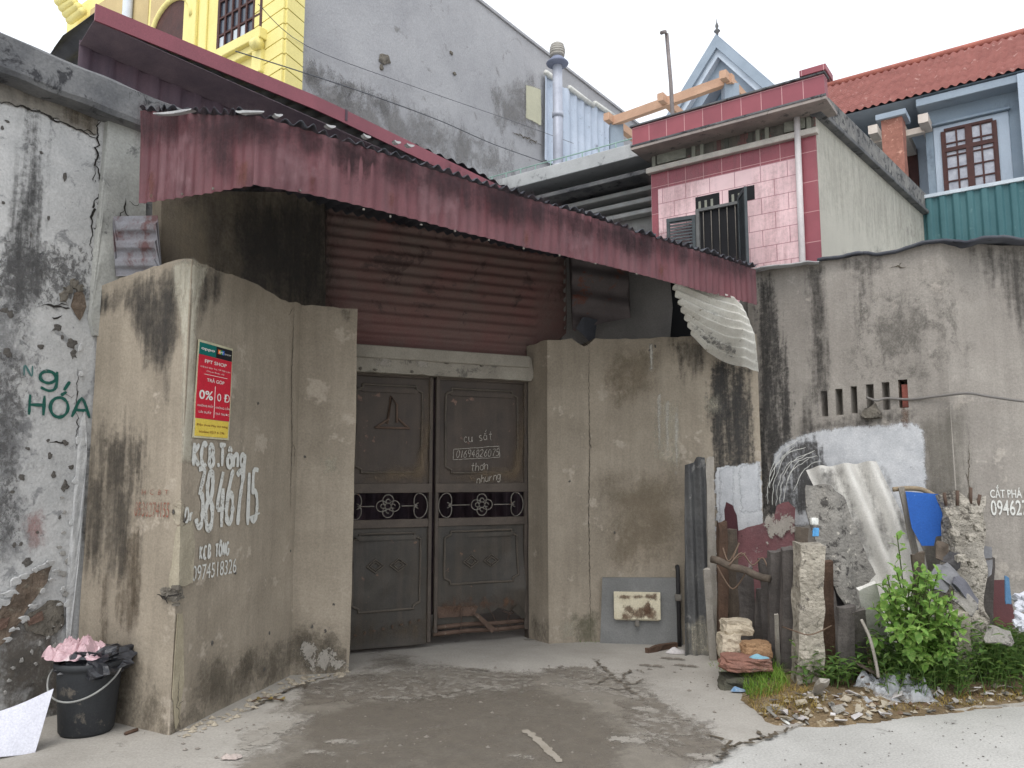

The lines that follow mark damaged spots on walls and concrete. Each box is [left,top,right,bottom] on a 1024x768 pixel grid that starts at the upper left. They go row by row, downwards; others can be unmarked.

crack [0,102,139,256]
water stain [0,164,93,553]
water stain [138,260,207,461]
water stain [696,273,791,521]
spalling [0,412,87,695]
water stain [83,439,140,625]